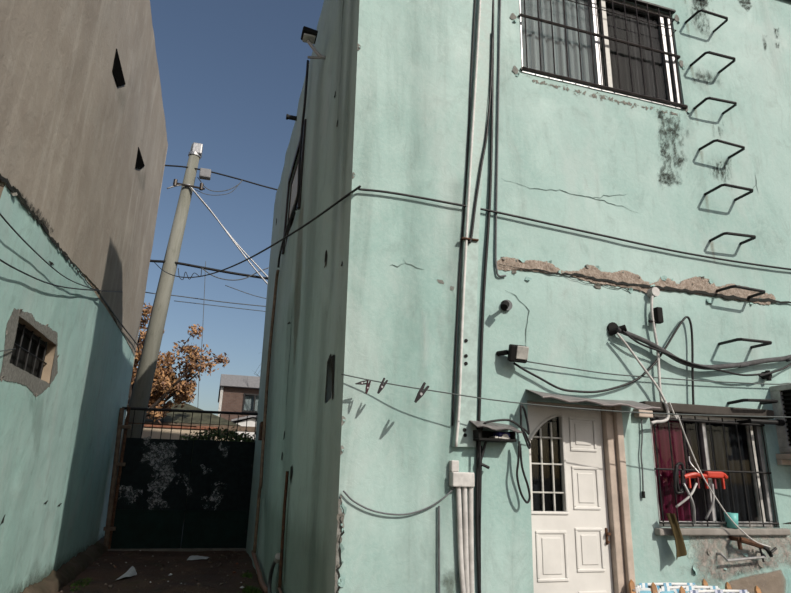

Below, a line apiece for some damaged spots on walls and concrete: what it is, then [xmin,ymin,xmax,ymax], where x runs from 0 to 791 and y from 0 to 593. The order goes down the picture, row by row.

damp [658,111,684,186]
crack [500,177,626,208]
flaking render [497,257,791,305]
spalling [335,495,346,593]